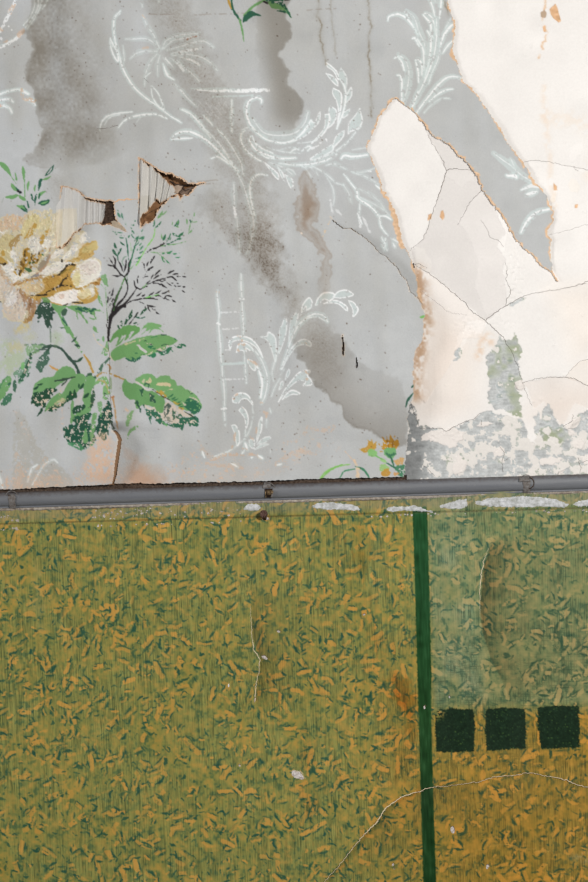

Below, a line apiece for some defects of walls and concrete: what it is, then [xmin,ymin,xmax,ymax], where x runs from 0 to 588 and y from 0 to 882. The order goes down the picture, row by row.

water stain [21,0,131,171]
water stain [252,0,305,136]
water stain [314,0,338,67]
spalling [540,3,561,22]
peeling [413,106,558,281]
crack [410,135,588,405]
peeling [259,224,588,480]
crack [250,606,261,701]
crack [324,773,584,882]